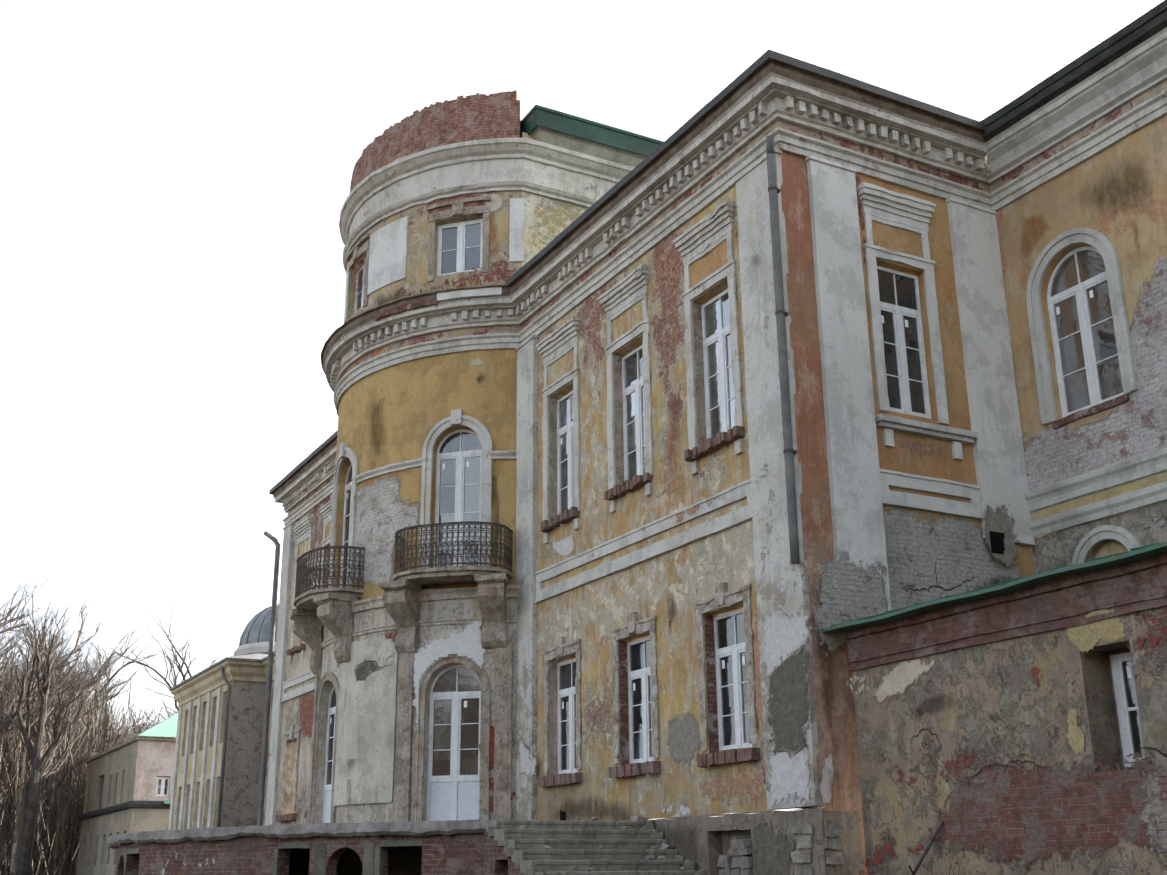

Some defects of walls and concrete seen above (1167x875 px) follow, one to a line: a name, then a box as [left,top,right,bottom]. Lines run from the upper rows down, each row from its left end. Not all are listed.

flaking render [1023,254,1167,491]
flaking render [346,468,421,586]
crack [900,564,974,604]
peeling [1063,608,1167,653]
flaking render [291,653,315,738]
spalling [695,505,1023,875]
flaking render [857,709,1167,875]
crack [977,753,1048,789]
crack [1139,747,1167,758]